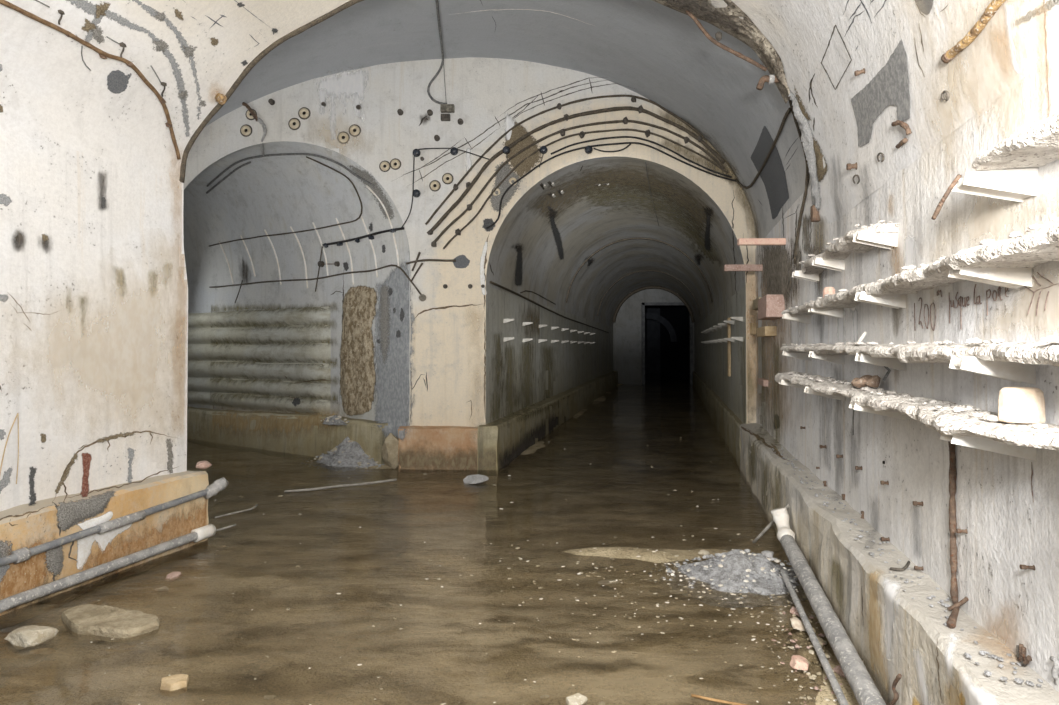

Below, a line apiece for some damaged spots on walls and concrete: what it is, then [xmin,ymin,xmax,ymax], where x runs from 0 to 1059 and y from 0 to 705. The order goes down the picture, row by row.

spalling [652,0,828,219]
peeling [0,468,12,492]
peeling [28,466,36,506]
crack [0,431,179,596]
spalling [57,491,132,570]
peeling [126,448,134,483]